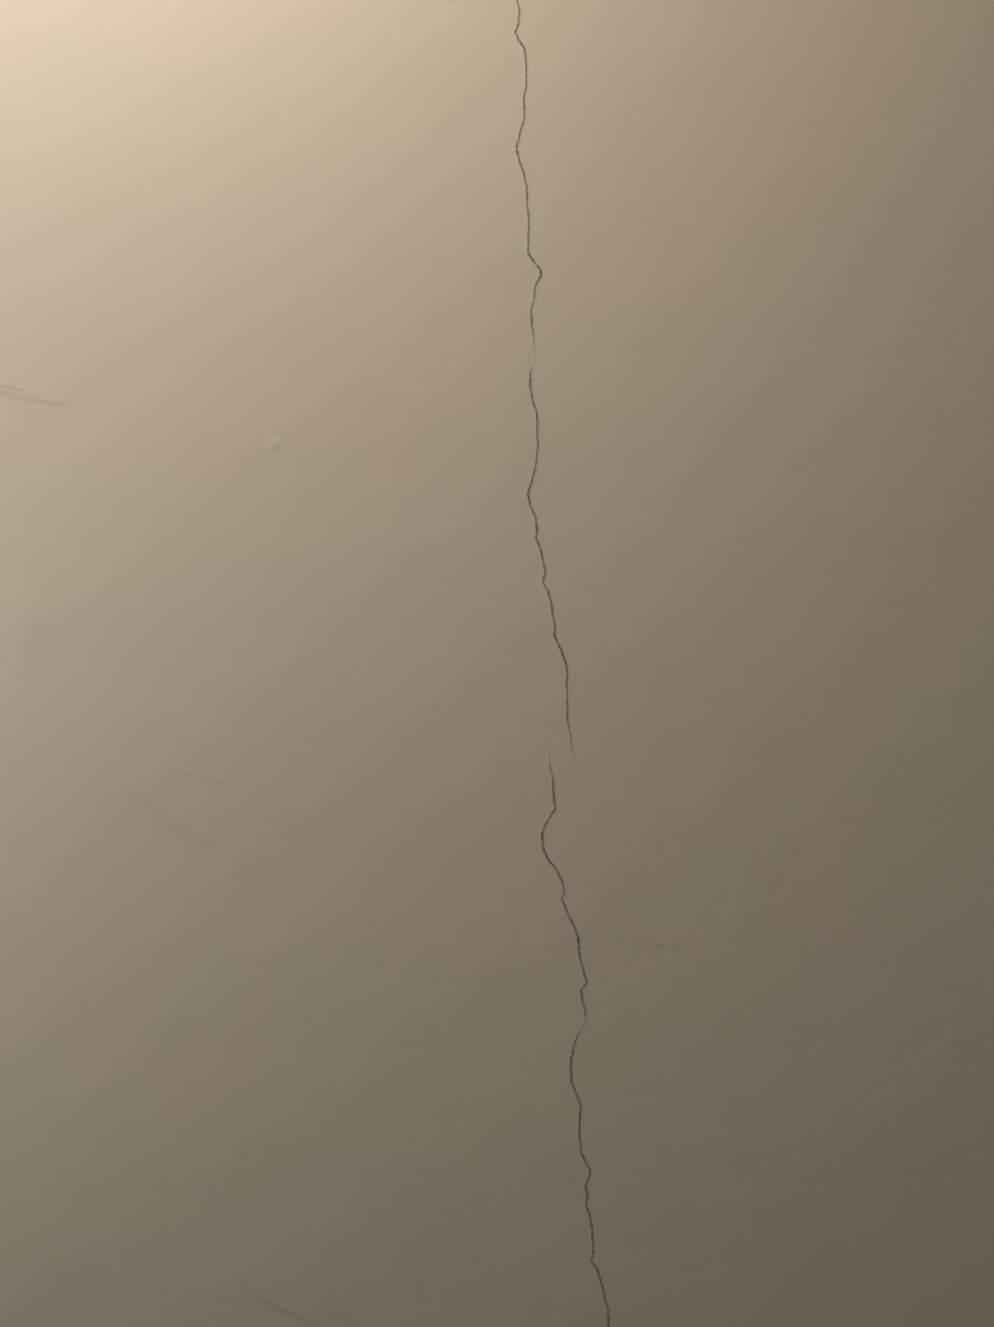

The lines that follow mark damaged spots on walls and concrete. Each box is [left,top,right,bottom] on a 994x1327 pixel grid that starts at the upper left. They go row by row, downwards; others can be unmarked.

crack [512,0,612,1327]